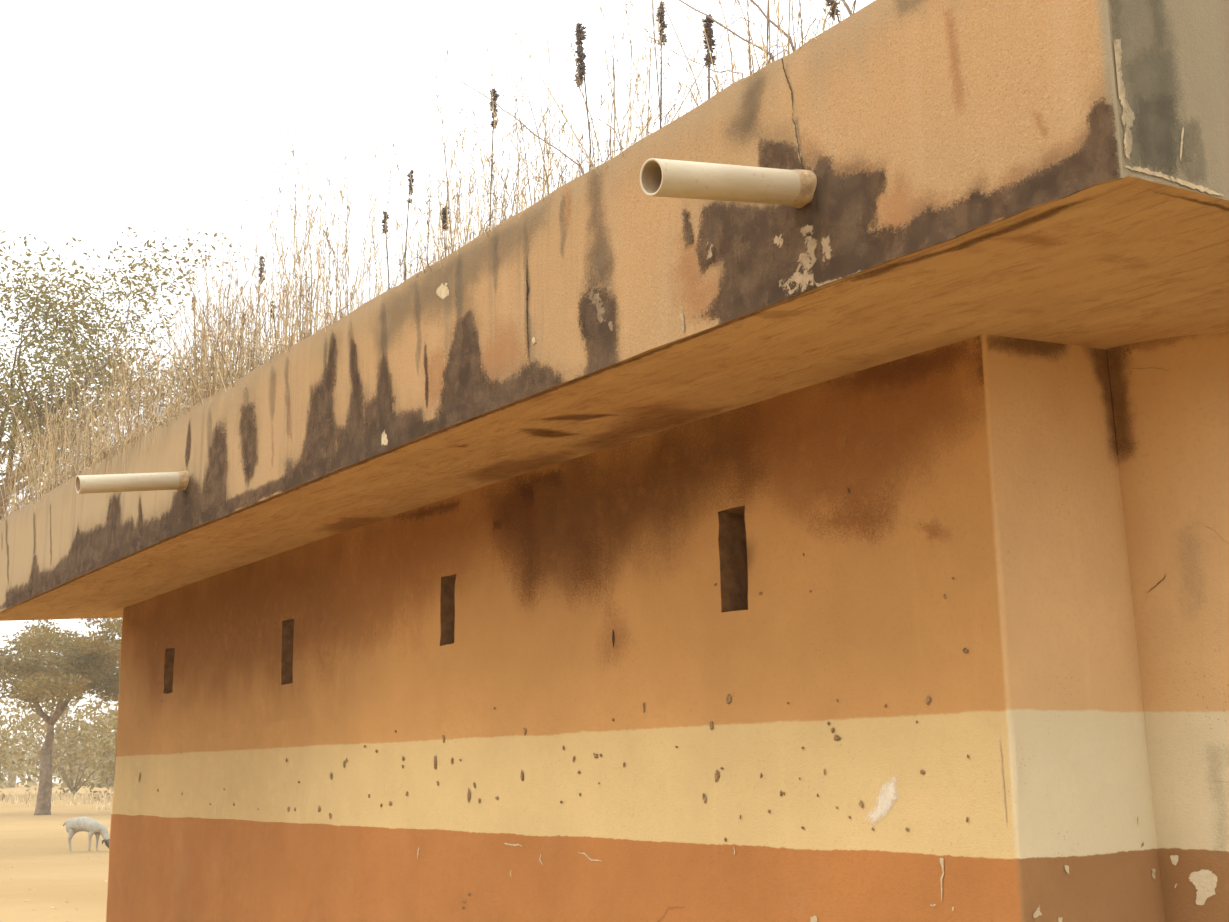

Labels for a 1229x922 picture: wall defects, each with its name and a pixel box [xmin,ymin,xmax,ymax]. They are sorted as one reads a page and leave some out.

crack [781,58,803,169]
peeling [779,224,862,296]
water stain [0,98,1120,609]
water stain [1096,347,1134,454]
peeling [1174,869,1217,905]